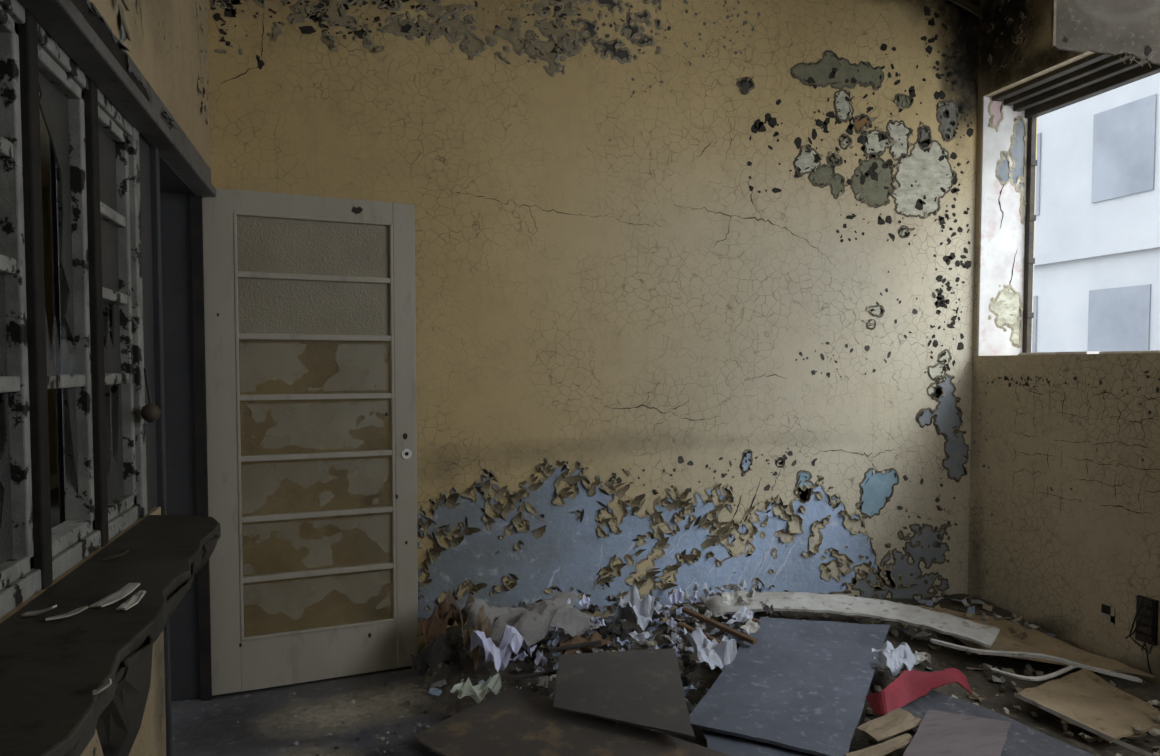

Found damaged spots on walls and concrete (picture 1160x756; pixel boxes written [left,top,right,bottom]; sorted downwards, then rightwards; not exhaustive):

mould [211,0,241,46]
mould [258,0,436,39]
mould [524,0,570,54]
peeling [988,96,1027,224]
peeling [417,2,991,623]
peeling [988,285,1023,348]
crack [1013,386,1160,513]